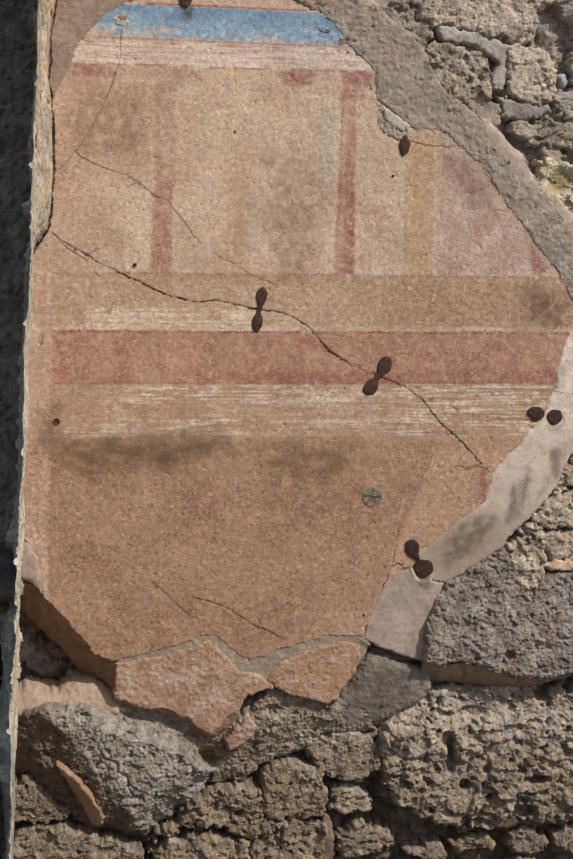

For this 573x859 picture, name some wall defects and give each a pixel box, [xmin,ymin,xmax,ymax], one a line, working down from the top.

crack [33,0,489,472]